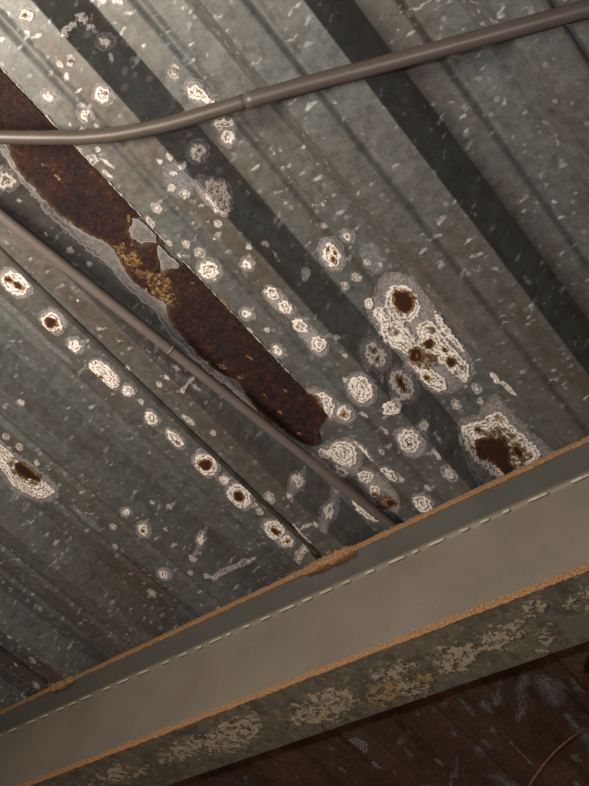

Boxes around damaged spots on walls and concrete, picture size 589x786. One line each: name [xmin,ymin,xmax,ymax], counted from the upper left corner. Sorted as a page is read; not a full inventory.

corrosion [14,3,37,28]
corrosion [60,11,116,63]
corrosion [56,54,75,68]
corrosion [0,70,57,130]
corrosion [69,83,115,128]
corrosion [167,63,220,106]
corrosion [211,116,237,148]
corrosion [0,139,589,715]
corrosion [18,562,589,786]